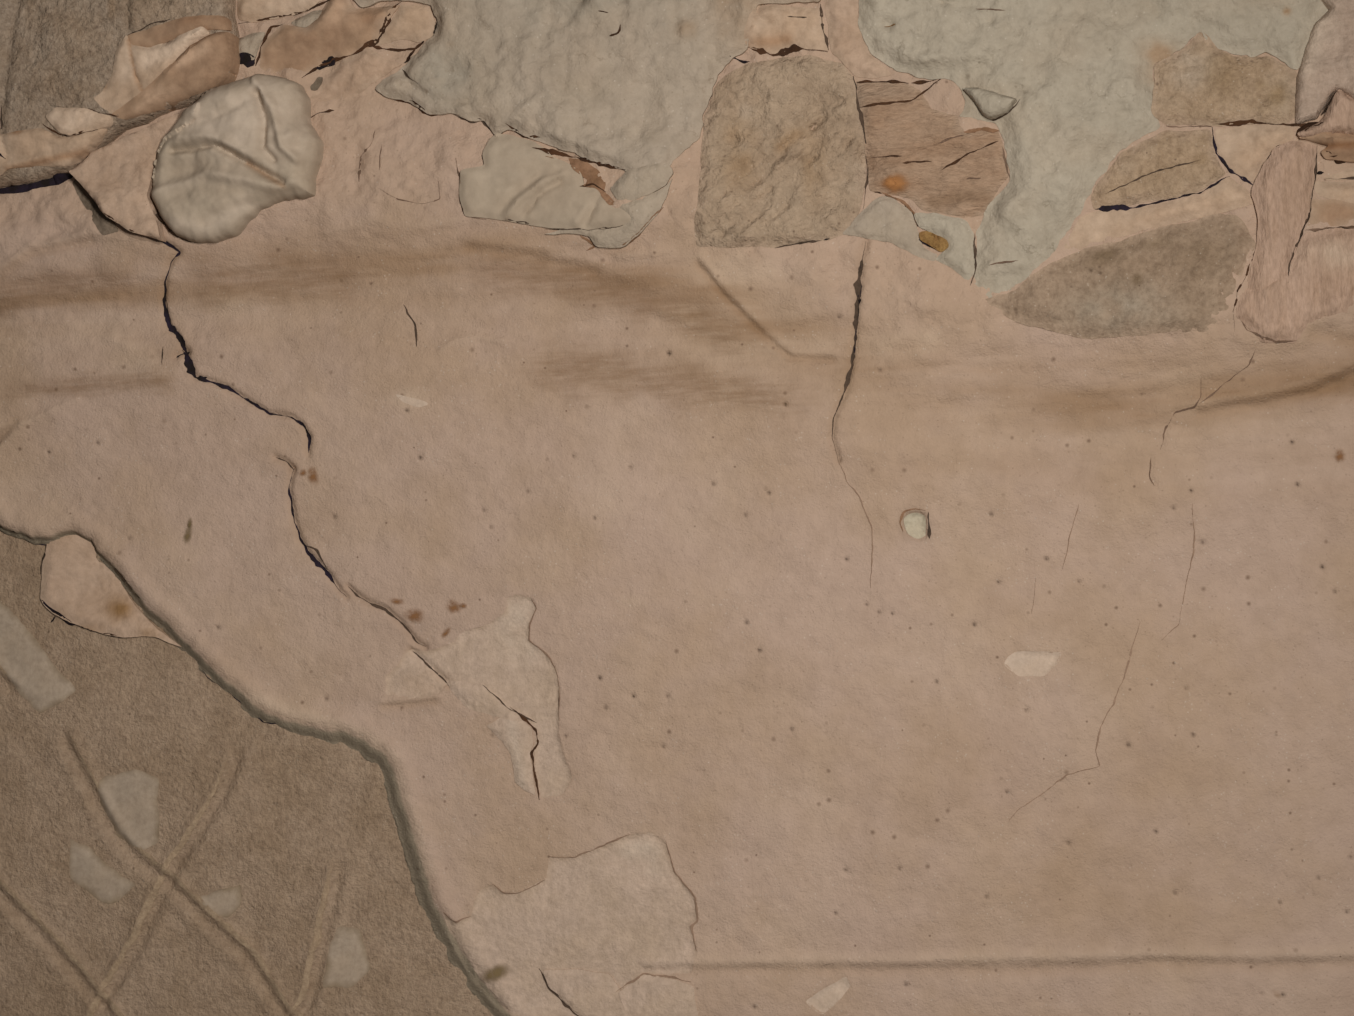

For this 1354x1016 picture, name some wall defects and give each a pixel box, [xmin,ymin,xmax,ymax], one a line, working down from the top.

spalling [73,179,118,235]
spalling [569,158,614,205]
crack [776,238,829,248]
spalling [963,87,1020,121]
crack [104,201,449,686]
crack [832,243,873,588]
spalling [0,530,699,1016]
crack [1011,504,1195,818]